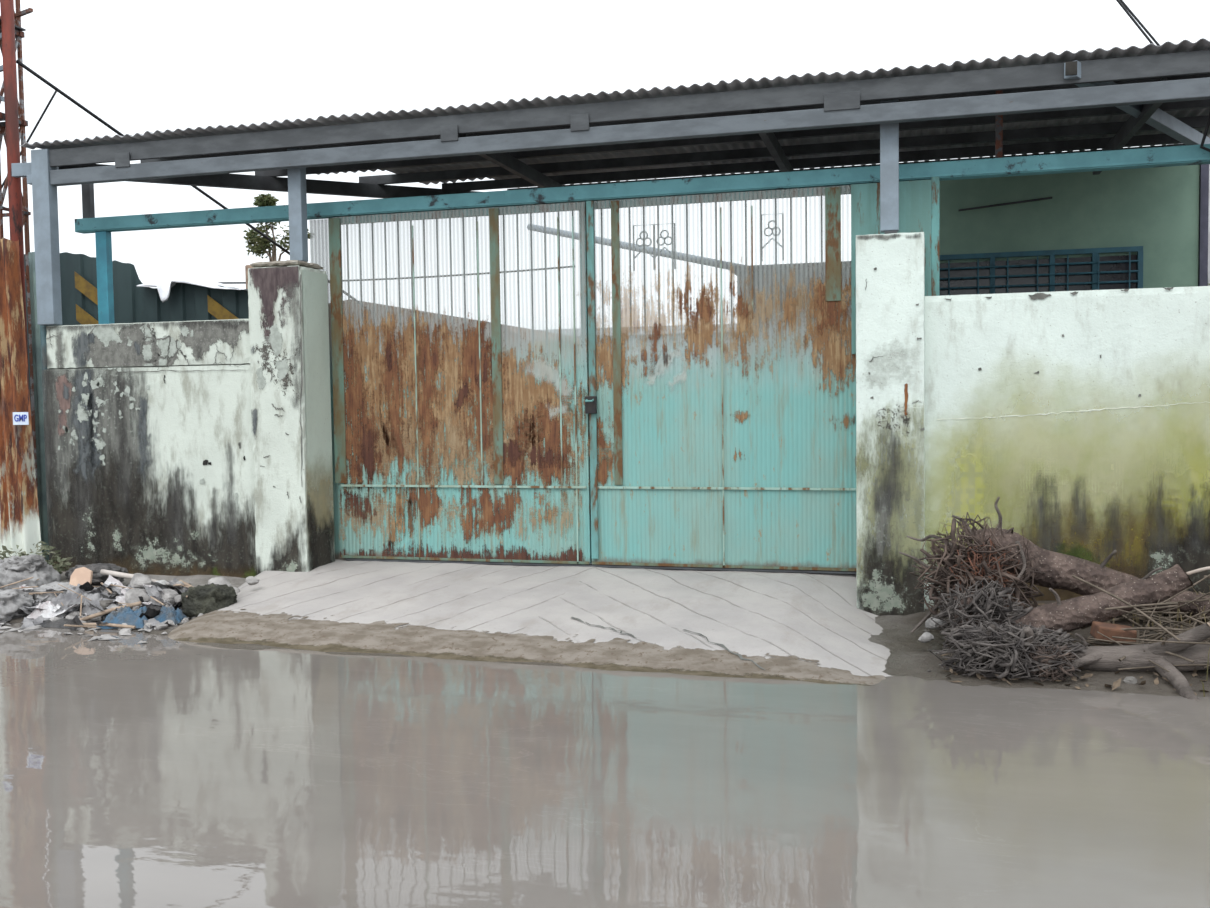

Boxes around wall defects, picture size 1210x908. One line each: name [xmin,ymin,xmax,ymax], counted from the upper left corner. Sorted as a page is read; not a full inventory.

peeling [55,320,299,465]
damp [41,266,335,578]
corrosion [340,263,856,561]
damp [857,405,939,616]
damp [1029,482,1210,595]